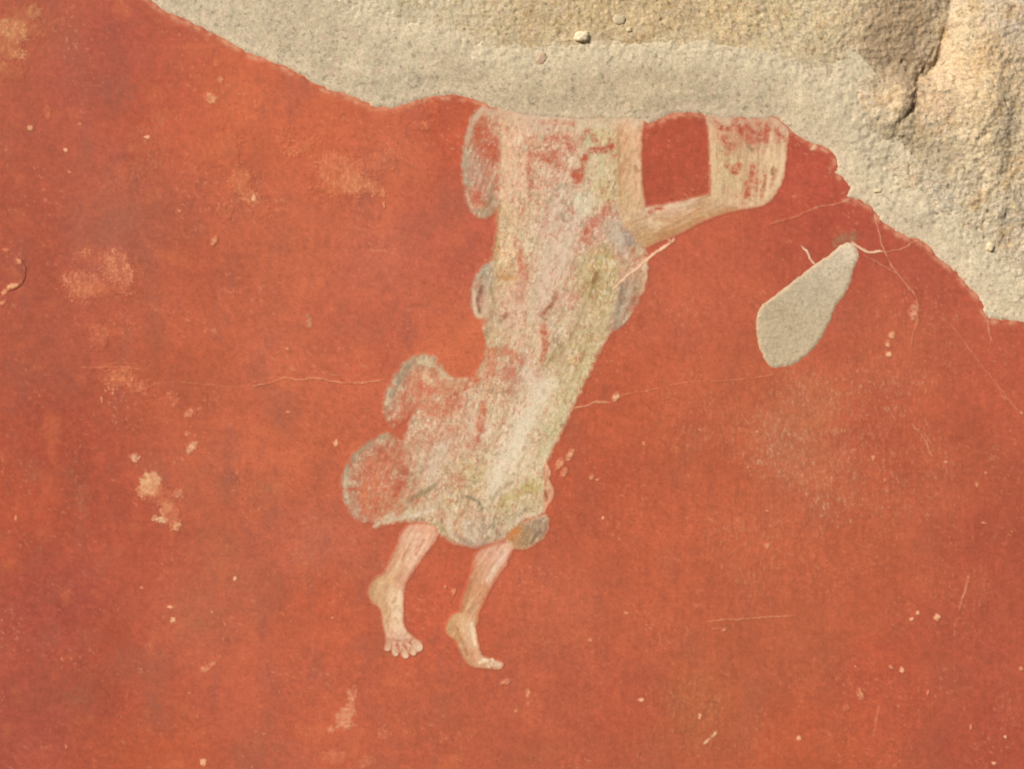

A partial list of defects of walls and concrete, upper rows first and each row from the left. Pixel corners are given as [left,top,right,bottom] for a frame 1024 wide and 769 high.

peeling [270,99,447,209]
crack [768,197,920,348]
peeling [908,299,921,323]
crack [152,376,387,389]
crack [575,372,790,409]
crack [949,319,1024,417]